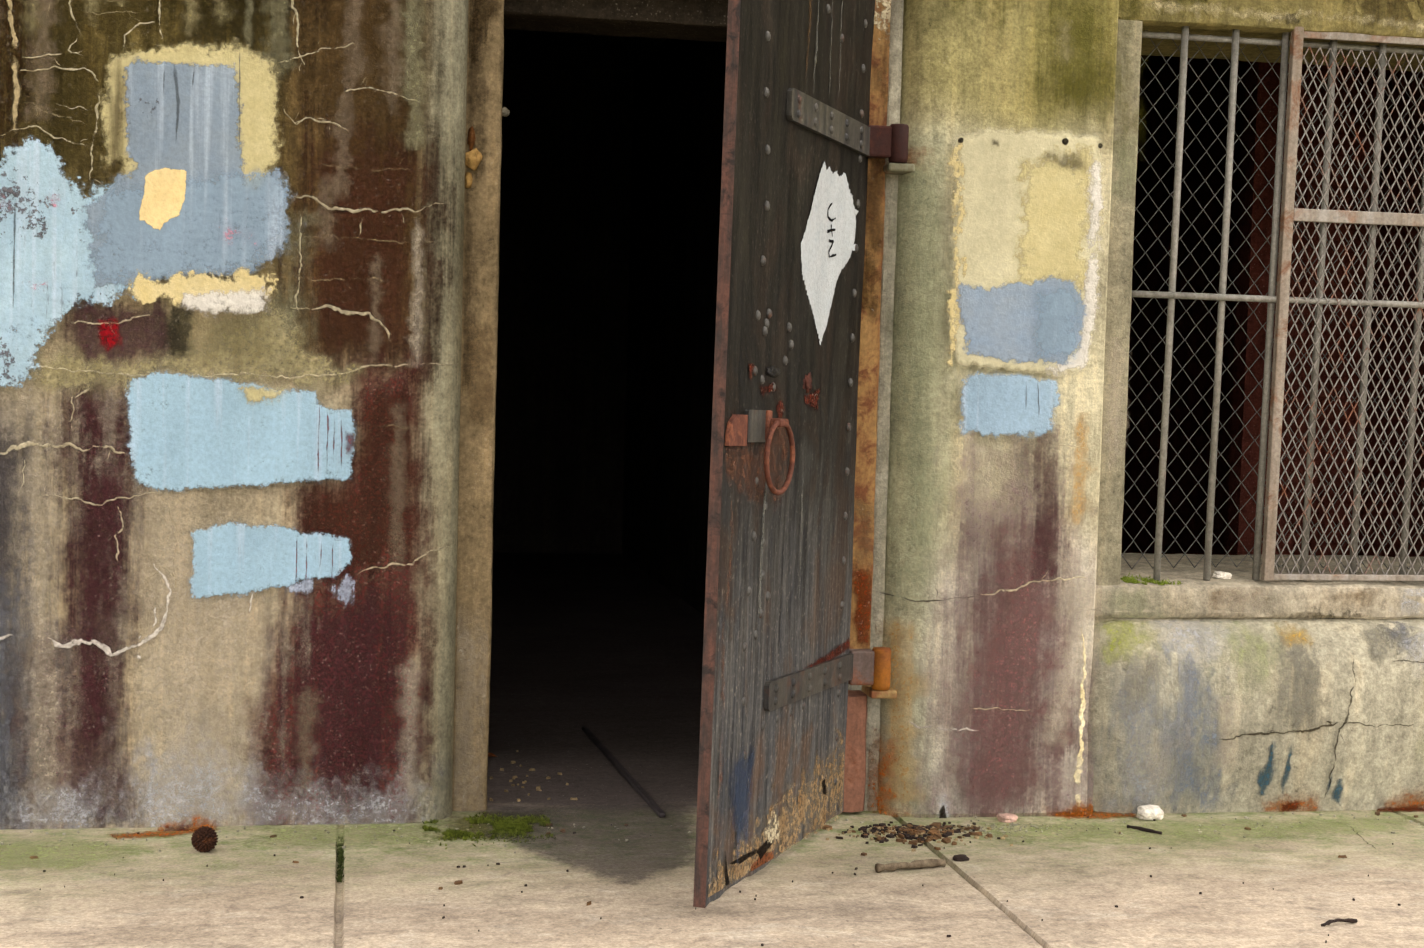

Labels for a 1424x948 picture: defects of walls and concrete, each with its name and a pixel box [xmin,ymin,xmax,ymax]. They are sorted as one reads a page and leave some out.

crack [1,0,163,182]
corrosion [874,0,891,102]
peeling [0,167,82,241]
crack [191,165,457,380]
peeling [0,337,16,385]
crack [0,365,154,560]
damp [0,0,446,829]
crack [50,566,172,659]
corrosion [807,541,872,668]
crack [1219,661,1413,796]
corrosion [1266,797,1318,812]
corrosion [1377,792,1424,812]